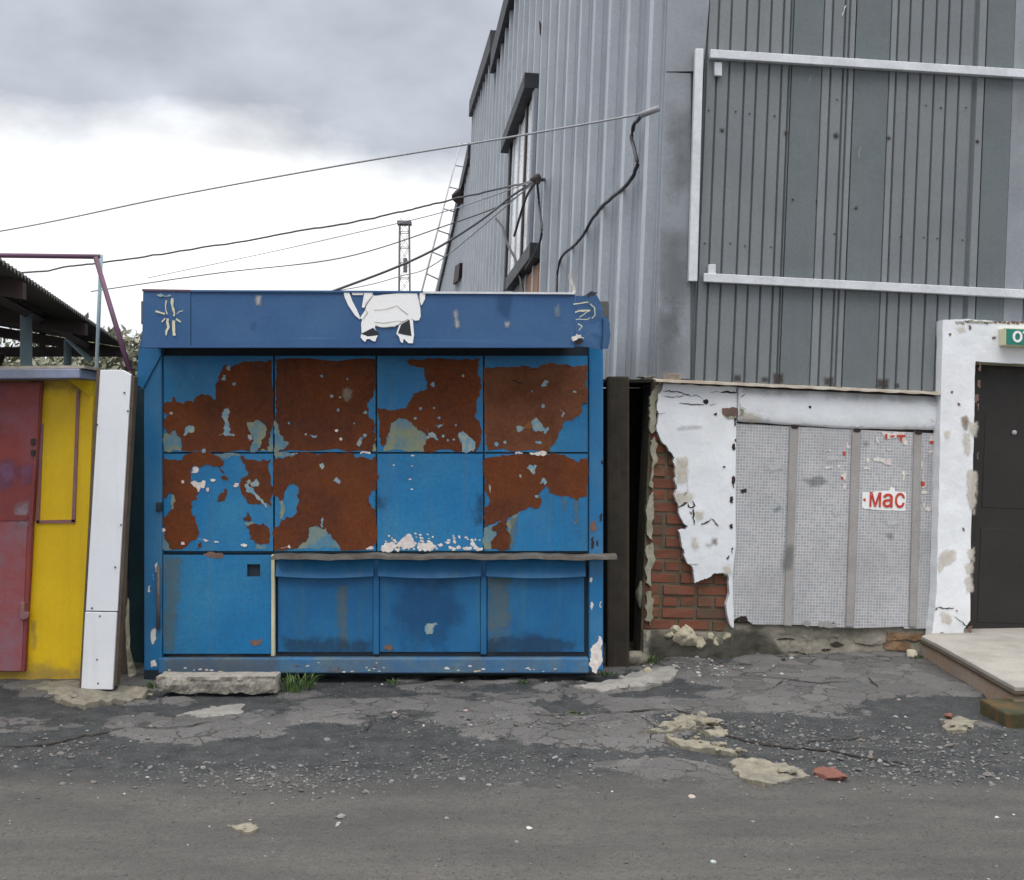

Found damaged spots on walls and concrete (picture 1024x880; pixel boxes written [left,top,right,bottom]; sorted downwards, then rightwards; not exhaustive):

crack [662,389,745,414]
rust [163,358,589,551]
peeling [951,363,981,509]
peeling [381,533,483,552]
spalling [643,382,748,641]
crack [675,458,718,526]
peeling [938,549,974,592]
peeling [589,636,603,673]